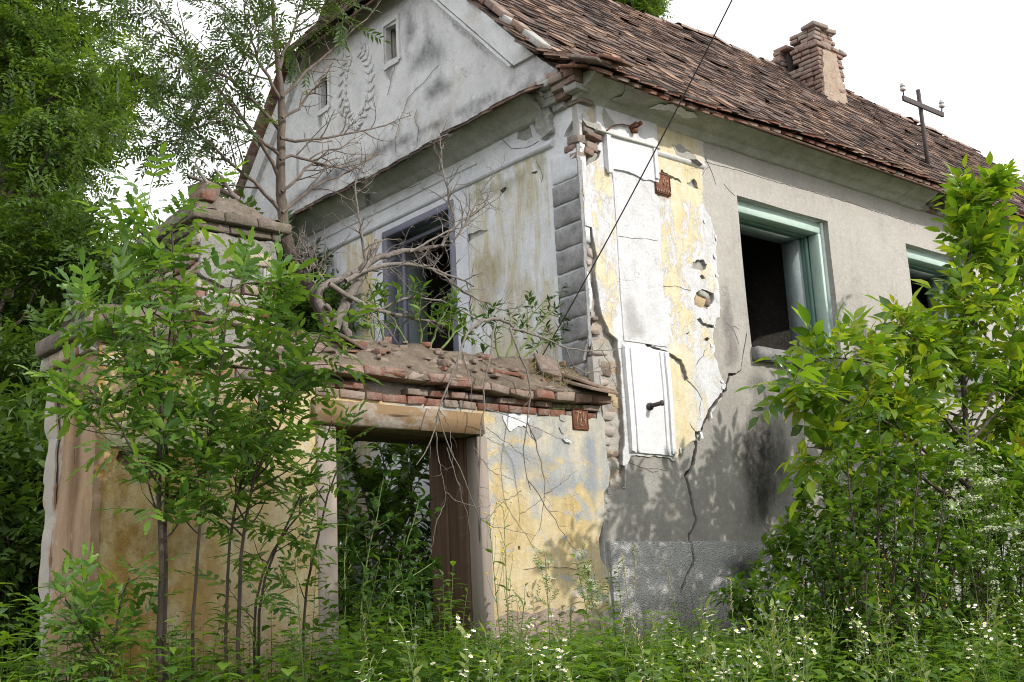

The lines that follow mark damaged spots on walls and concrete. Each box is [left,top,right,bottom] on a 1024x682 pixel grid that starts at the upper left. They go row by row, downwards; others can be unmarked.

peeling [672,144,703,166]
spalling [694,289,719,347]
spalling [581,243,622,490]
peeling [503,413,543,441]
crack [629,432,699,493]